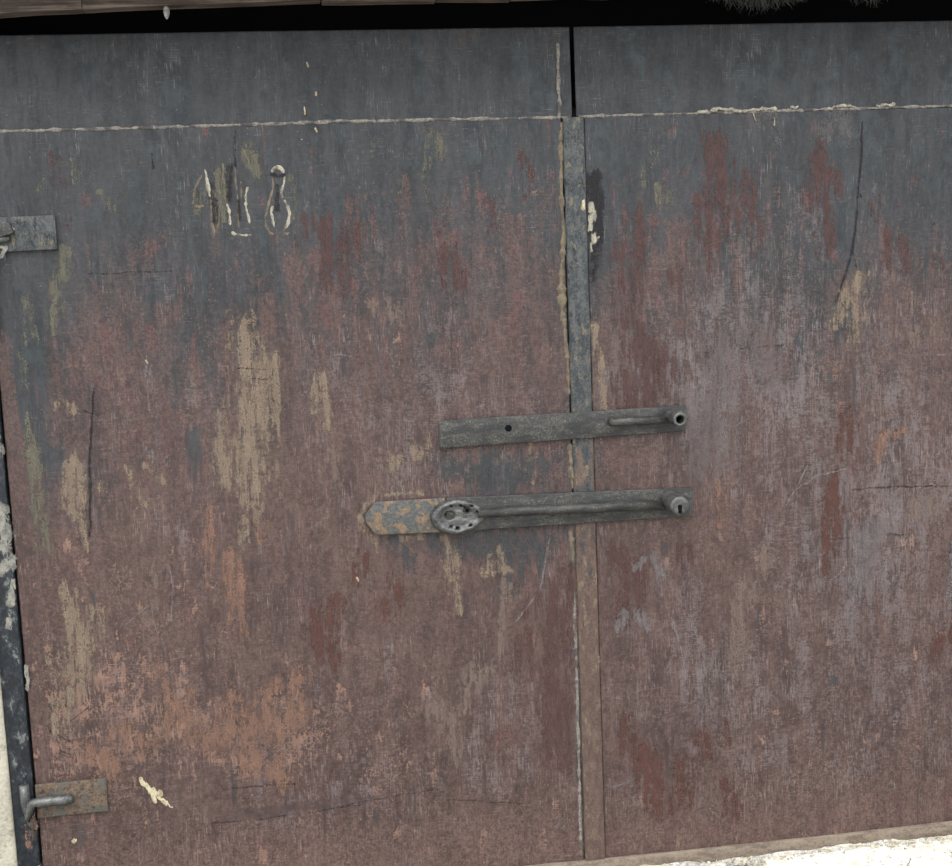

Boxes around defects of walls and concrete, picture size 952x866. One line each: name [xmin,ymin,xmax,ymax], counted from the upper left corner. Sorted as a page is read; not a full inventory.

corrosion [611,204,678,410]
peeling [0,502,18,630]
peeling [201,309,282,641]
corrosion [821,406,859,579]
peeling [45,578,107,742]
peeling [139,777,173,808]
peeling [74,572,314,796]
corrosion [619,711,732,821]